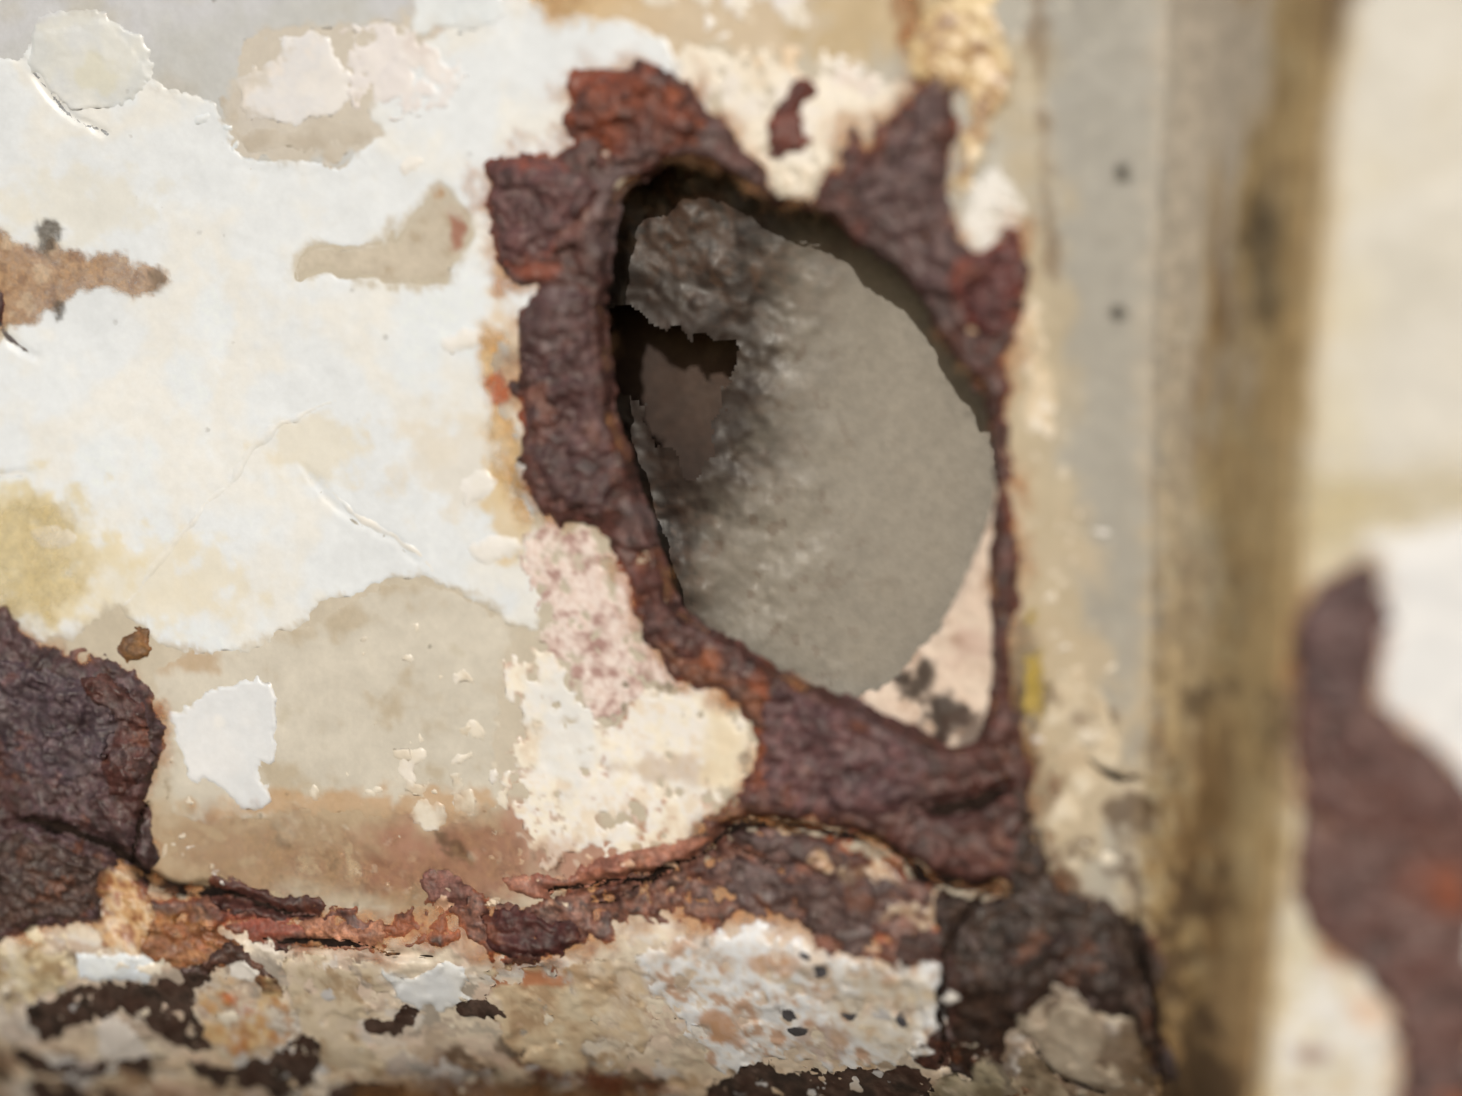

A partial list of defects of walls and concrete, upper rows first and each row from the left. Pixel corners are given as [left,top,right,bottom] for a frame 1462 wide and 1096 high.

rust [358,1070,659,1096]
peeling [0,0,1027,882]
rust [0,58,1178,1085]
peeling [1013,297,1058,439]
rust [1288,561,1462,1096]
peeling [1360,517,1462,775]